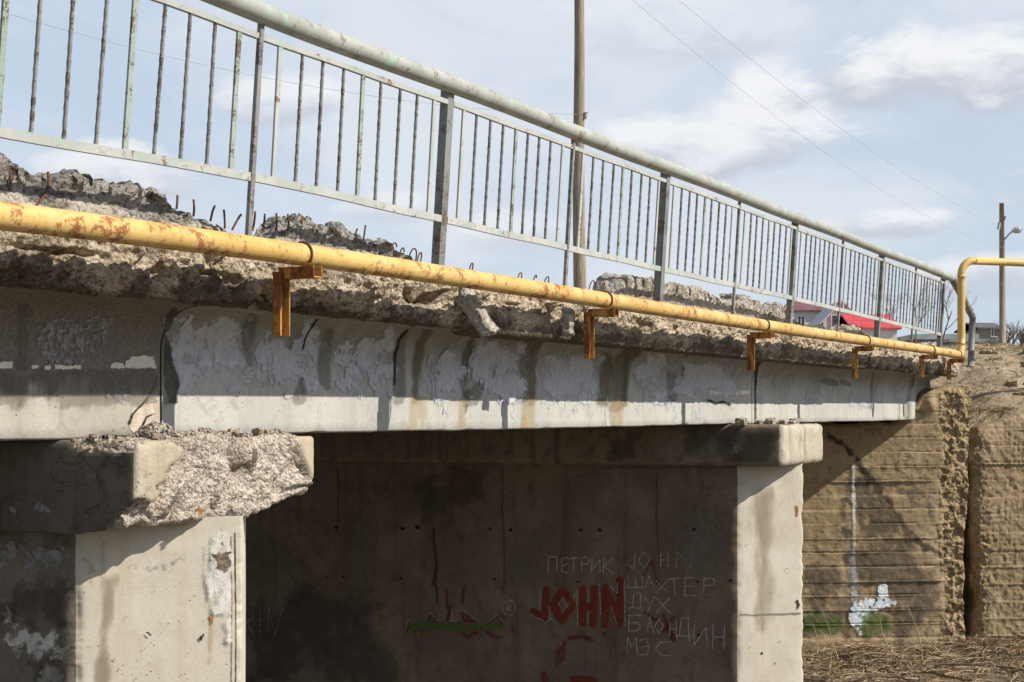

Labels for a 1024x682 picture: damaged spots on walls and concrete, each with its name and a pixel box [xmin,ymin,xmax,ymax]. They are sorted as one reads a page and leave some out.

peeling [164,309,400,405]
crack [302,319,319,351]
leakage [413,329,431,402]
leakage [462,337,478,410]
leakage [529,342,541,404]
leakage [598,349,639,411]
spalling [212,542,231,572]
crack [430,528,438,605]